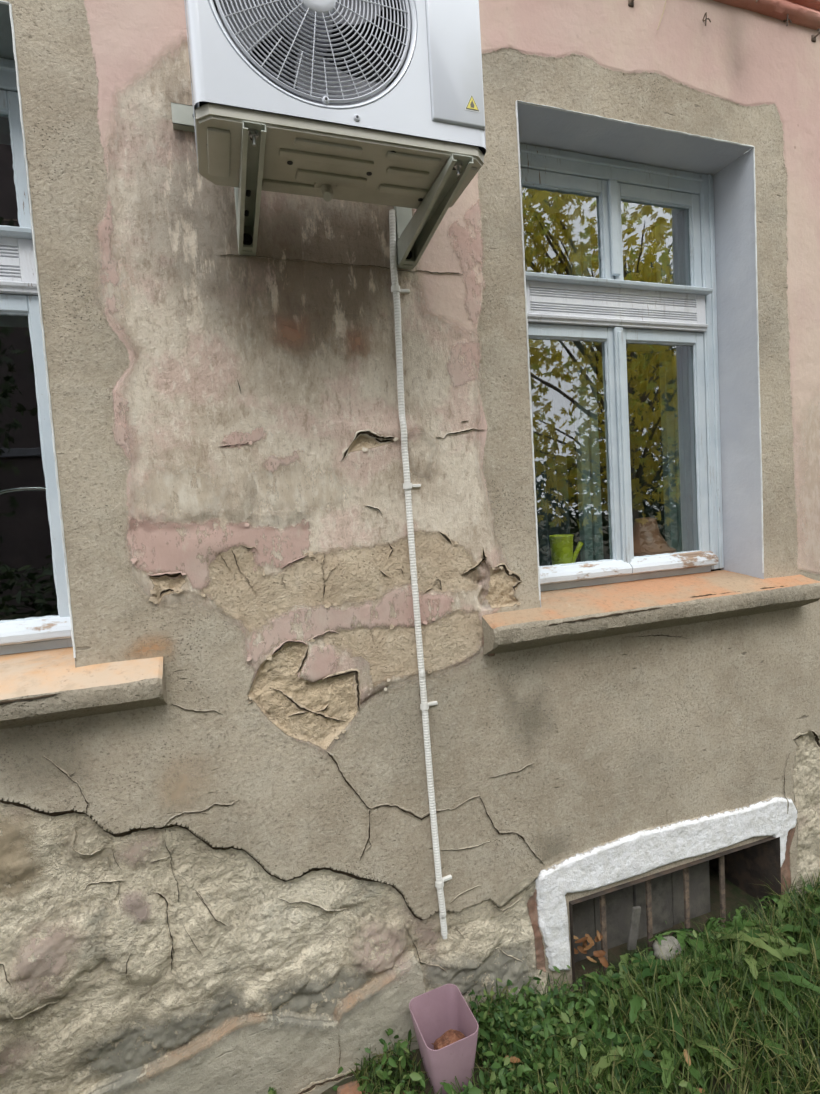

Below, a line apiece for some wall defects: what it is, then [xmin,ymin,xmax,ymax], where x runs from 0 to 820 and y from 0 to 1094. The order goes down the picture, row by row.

peeling [97,41,521,753]
crack [341,429,394,461]
crack [0,751,545,972]